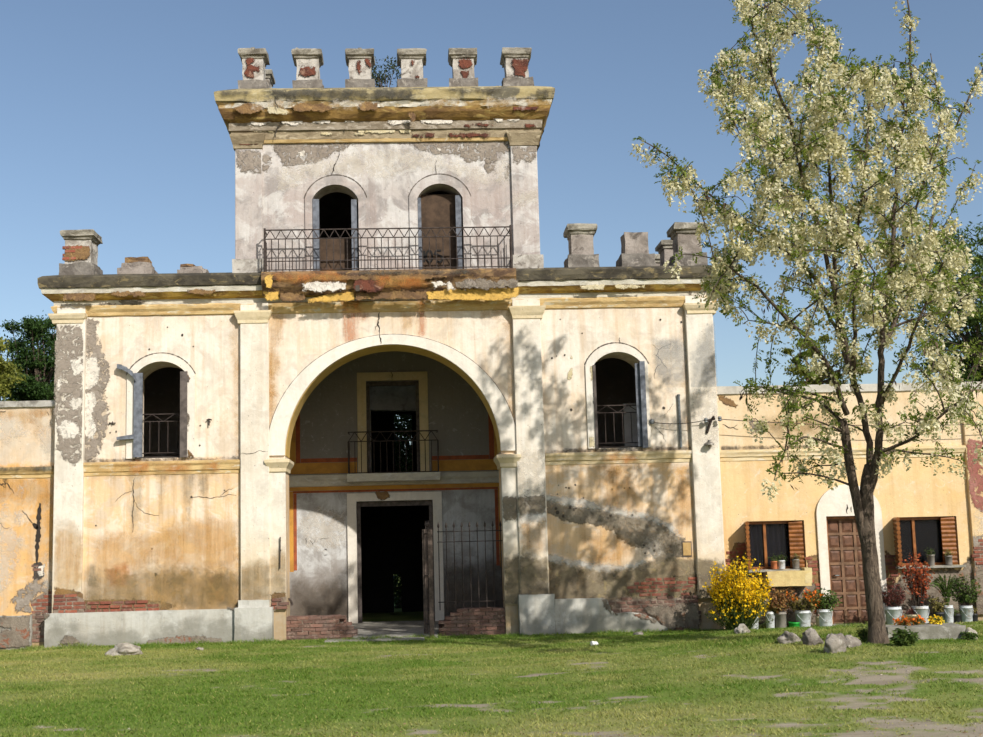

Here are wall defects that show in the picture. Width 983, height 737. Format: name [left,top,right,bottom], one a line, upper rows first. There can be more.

spalling [244,57,260,78]
spalling [299,67,316,76]
spalling [458,58,473,78]
spalling [512,58,530,77]
flaking render [233,100,539,179]
flaking render [263,273,519,303]
flaking render [49,318,117,466]
crack [115,478,159,532]
flaking render [502,484,686,563]
flaking render [0,564,175,649]
spalling [602,574,702,630]
spalling [885,535,983,619]